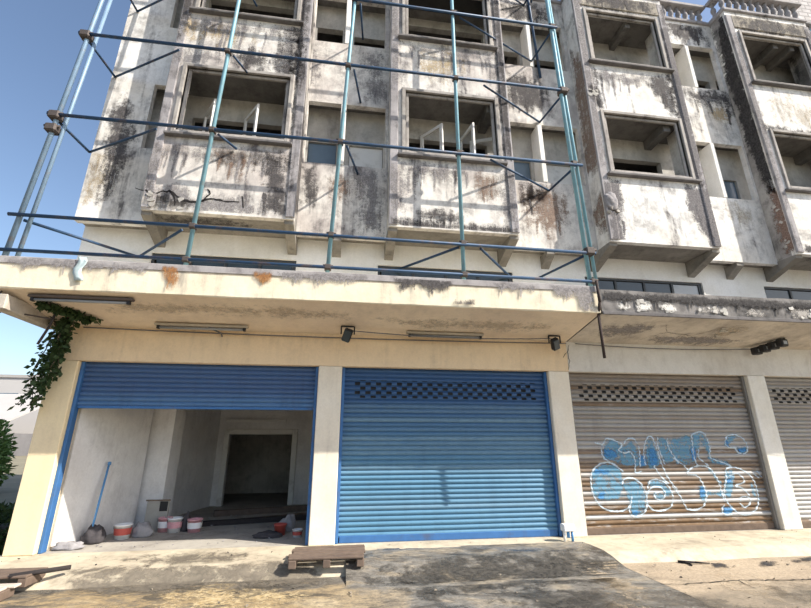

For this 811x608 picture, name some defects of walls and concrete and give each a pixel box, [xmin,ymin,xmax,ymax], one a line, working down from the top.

leakage [364,0,553,161]
leakage [144,0,321,228]
leakage [570,0,811,246]
leakage [85,98,136,204]
crack [136,188,244,208]
leakage [329,162,569,239]
corrosion [162,266,179,289]
corrosion [254,272,272,285]
peeling [617,299,677,313]
leakage [604,291,811,315]
peeling [698,306,728,315]
peeling [788,307,811,319]